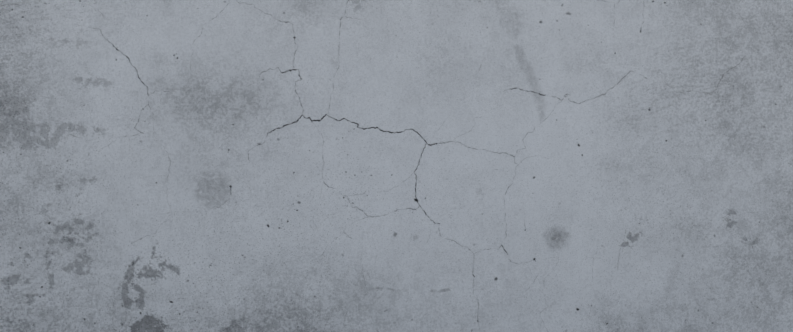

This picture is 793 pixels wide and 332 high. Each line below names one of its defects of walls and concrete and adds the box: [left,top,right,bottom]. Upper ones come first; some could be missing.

crack [273,114,440,224]